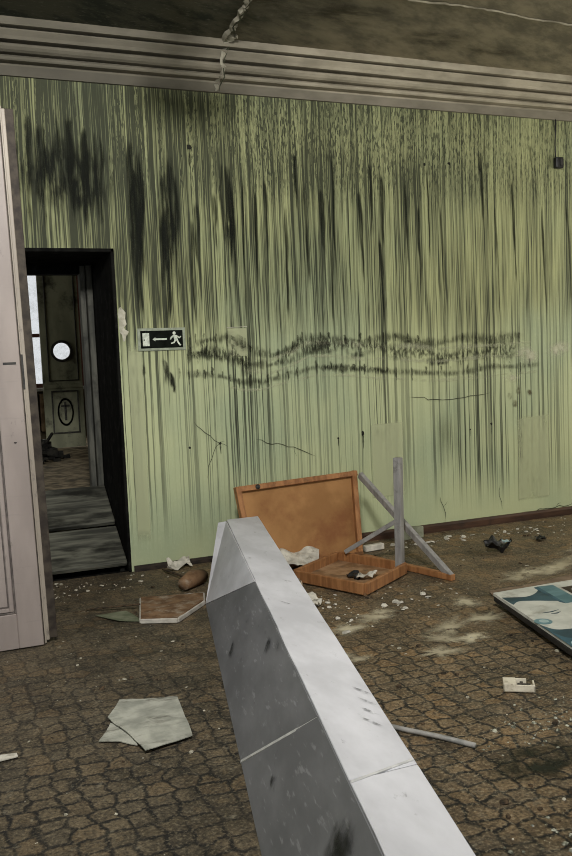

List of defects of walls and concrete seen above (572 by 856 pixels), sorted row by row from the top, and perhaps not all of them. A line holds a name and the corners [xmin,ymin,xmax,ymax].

damp [16,121,46,194]
damp [57,121,104,219]
damp [126,147,145,301]
damp [160,161,180,313]
damp [191,208,199,316]
damp [213,171,269,275]
damp [319,161,337,318]
damp [358,166,385,314]
damp [404,186,441,279]
damp [189,332,520,388]
damp [506,744,572,777]